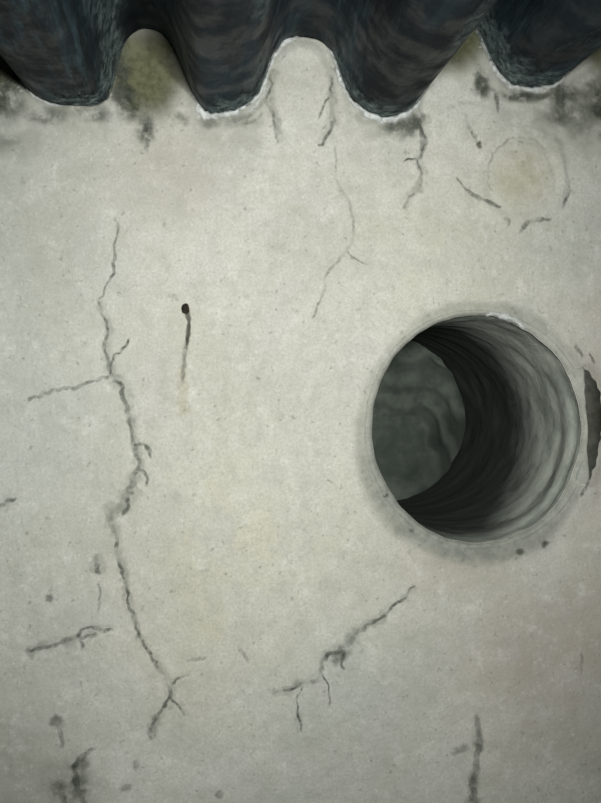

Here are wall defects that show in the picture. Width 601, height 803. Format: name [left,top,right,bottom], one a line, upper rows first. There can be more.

water stain [0,76,18,112]
water stain [476,72,489,95]
water stain [554,84,574,120]
water stain [388,115,423,134]
spalling [584,369,601,480]